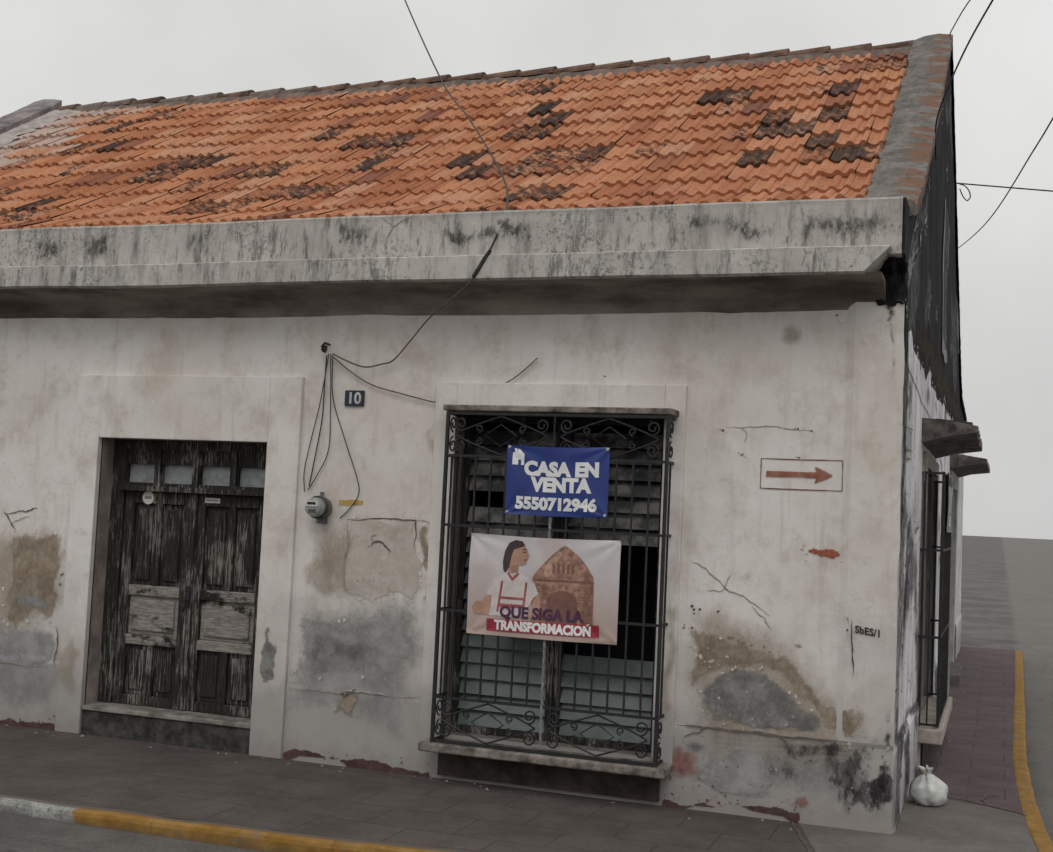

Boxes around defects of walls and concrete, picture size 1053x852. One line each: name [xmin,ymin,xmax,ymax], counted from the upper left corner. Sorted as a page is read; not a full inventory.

damp [449,219,529,247]
damp [805,218,880,238]
peeling [876,198,953,420]
peeling [951,292,959,388]
crack [726,426,809,442]
peeling [940,453,964,475]
crack [3,508,38,529]
flaking render [2,528,65,627]
flaking render [345,517,422,617]
crack [692,562,771,629]
damp [651,284,960,824]
damp [304,614,416,719]